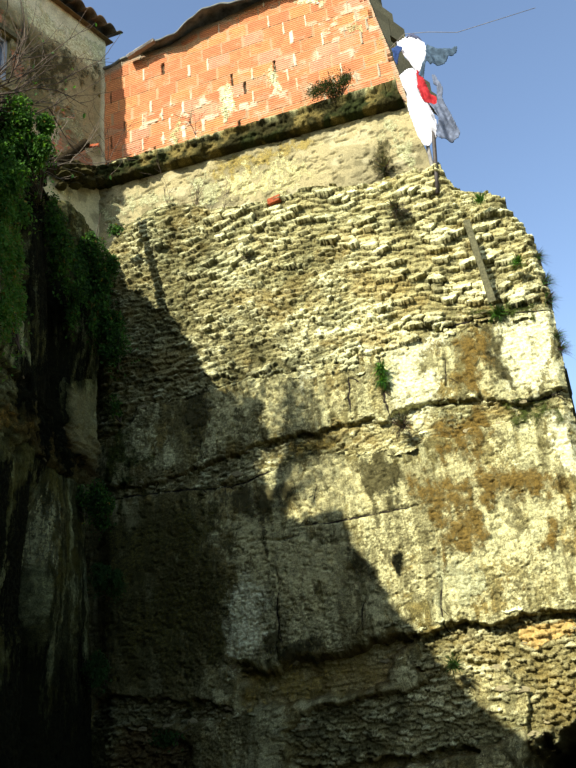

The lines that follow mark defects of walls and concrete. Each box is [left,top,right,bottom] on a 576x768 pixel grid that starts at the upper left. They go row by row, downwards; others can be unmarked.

crack [339,357,398,426]
crack [514,389,565,405]
water stain [0,174,99,768]
crack [253,477,416,544]
water stain [98,448,404,715]
crack [275,570,283,655]
crack [440,566,452,634]